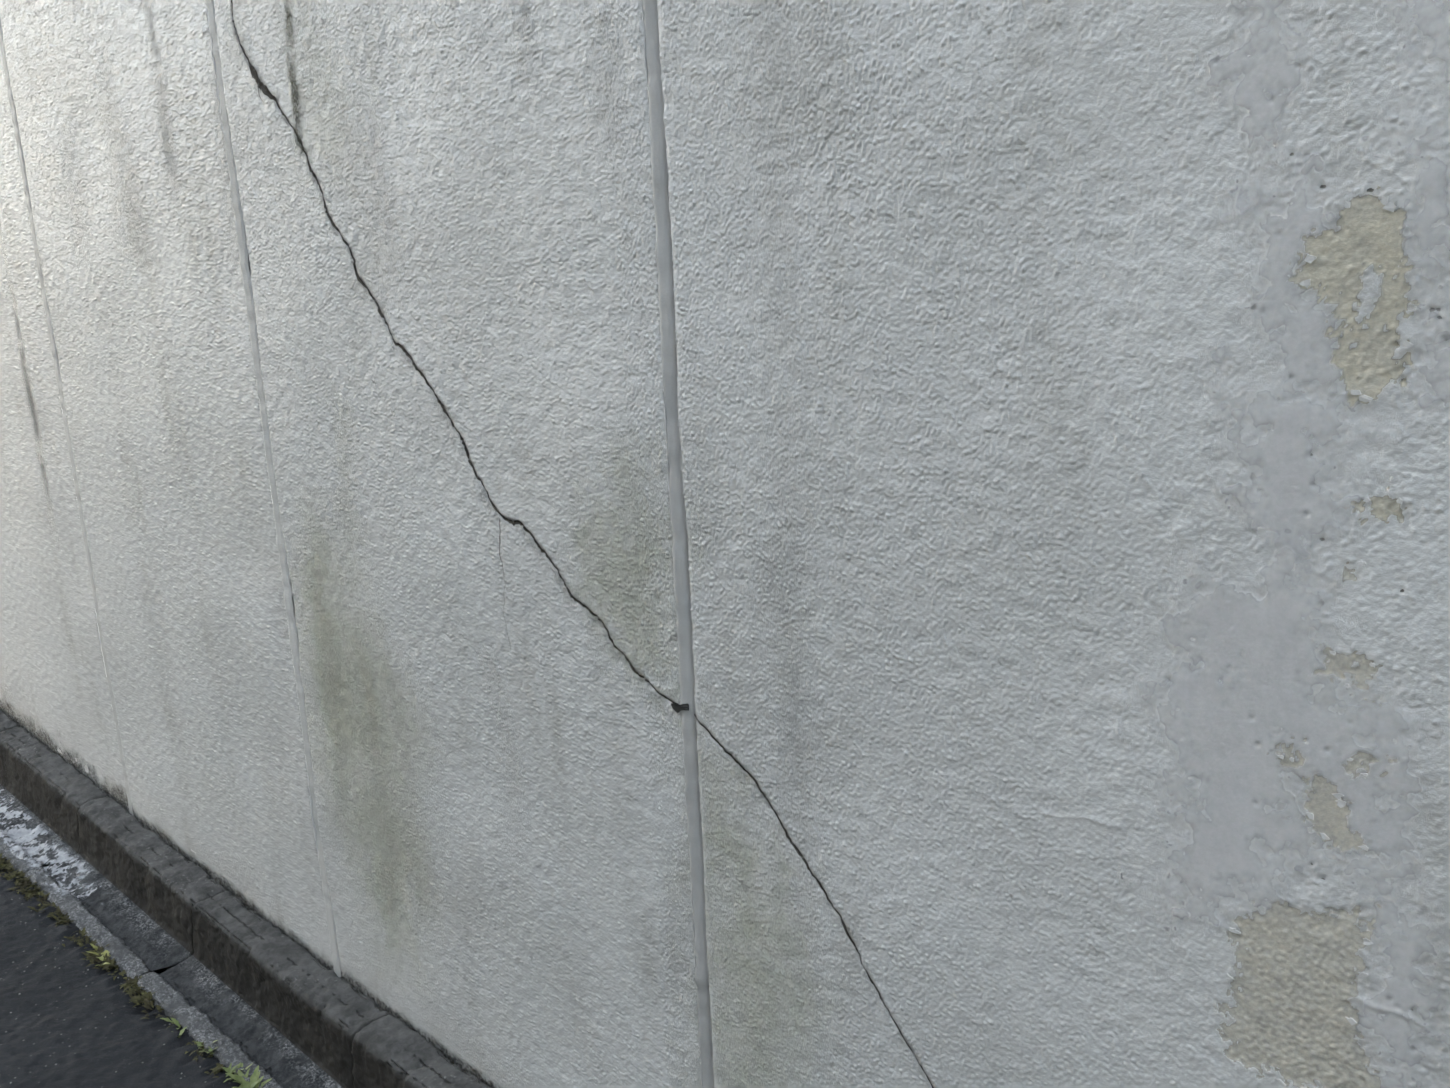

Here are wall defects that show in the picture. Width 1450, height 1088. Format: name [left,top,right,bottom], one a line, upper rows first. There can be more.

peeling [1288,187,1442,407]
crack [231,0,934,1088]
water stain [0,701,494,1088]
peeling [1218,901,1381,1088]